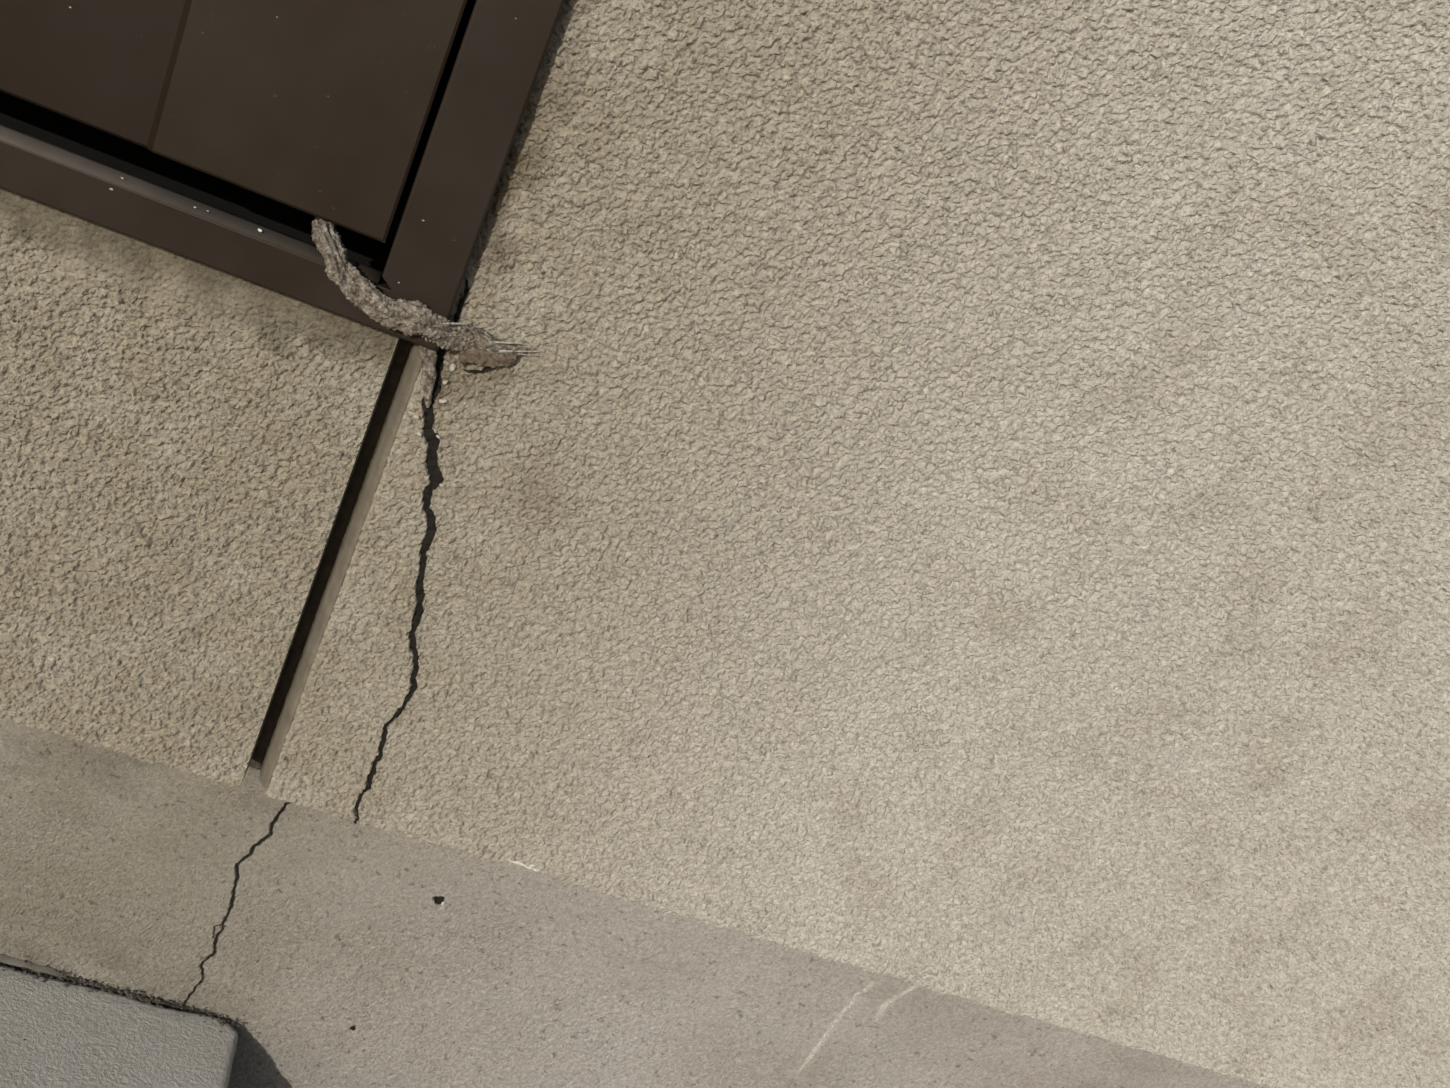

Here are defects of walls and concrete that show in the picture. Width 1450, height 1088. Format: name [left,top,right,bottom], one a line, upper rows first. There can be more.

crack [353,280,518,824]
crack [14,802,291,1016]